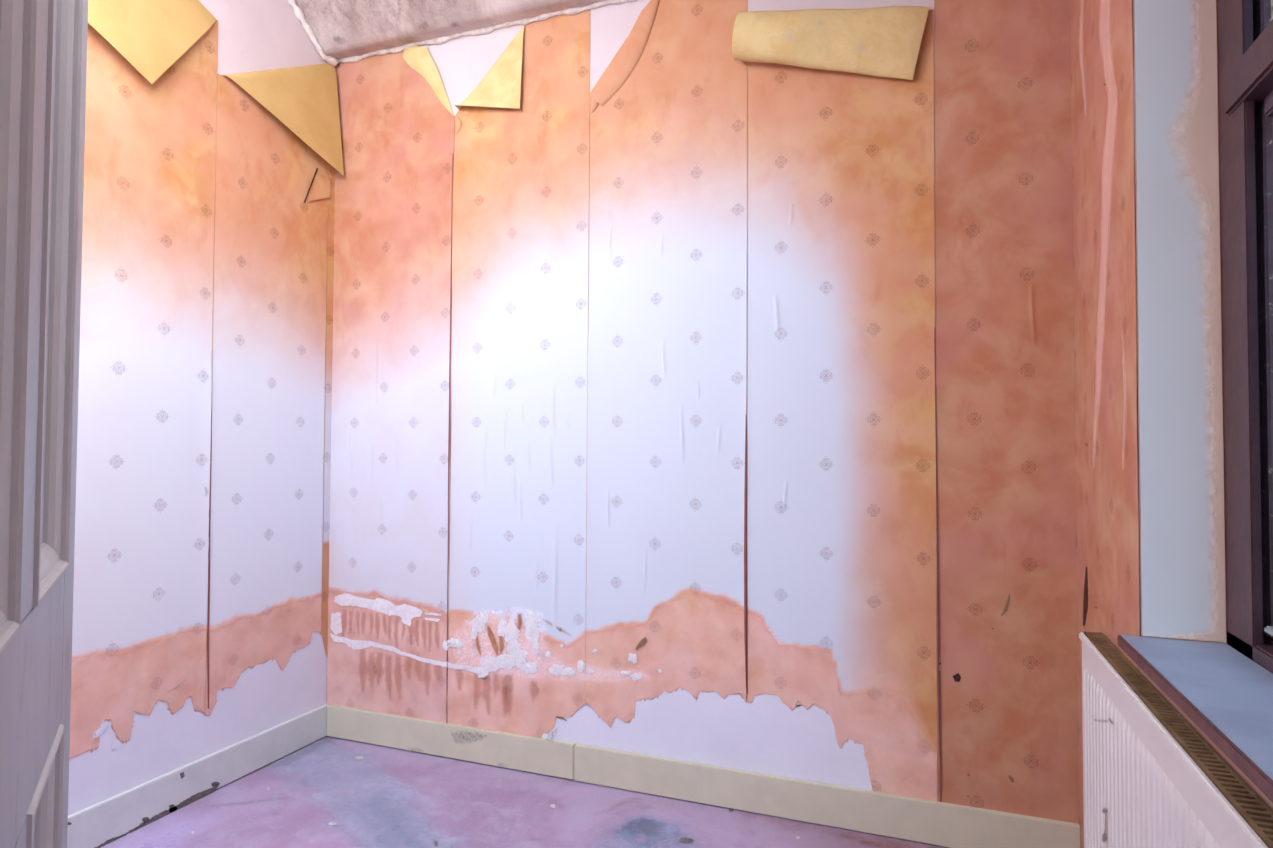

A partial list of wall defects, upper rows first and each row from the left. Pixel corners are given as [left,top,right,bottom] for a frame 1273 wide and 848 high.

peeling [200,0,327,75]
peeling [422,24,524,116]
water stain [71,61,942,703]
peeling [68,593,487,825]
peeling [541,687,872,791]
peeling [94,782,220,848]